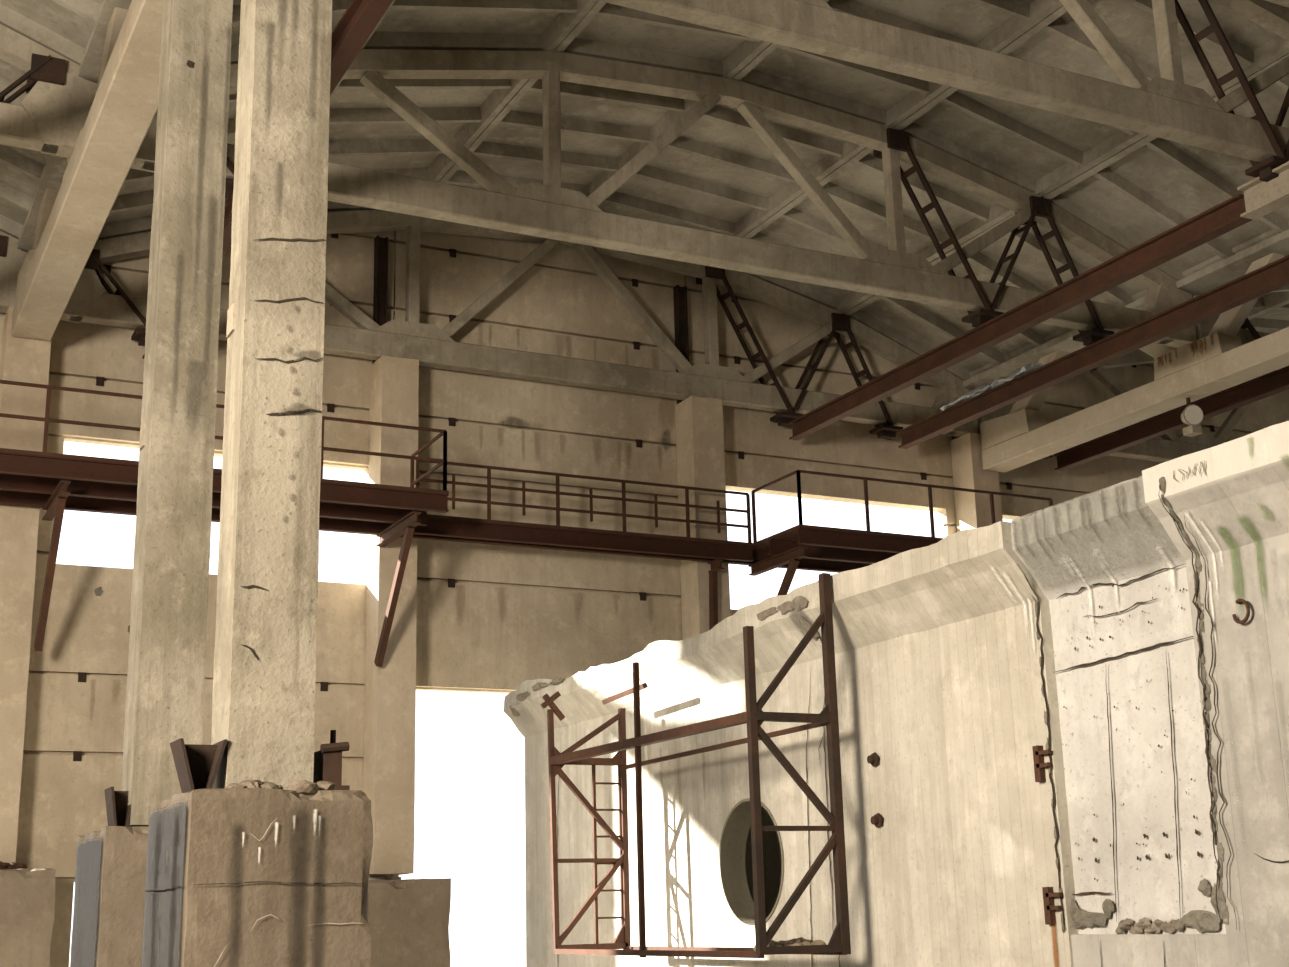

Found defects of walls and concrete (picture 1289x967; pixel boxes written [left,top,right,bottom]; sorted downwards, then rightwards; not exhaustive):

crack [256,235,324,243]
crack [254,296,323,304]
crack [255,356,323,364]
crack [266,407,320,415]
leakage [1240,518,1265,587]
leakage [1185,512,1243,640]
spalling [1017,477,1237,934]